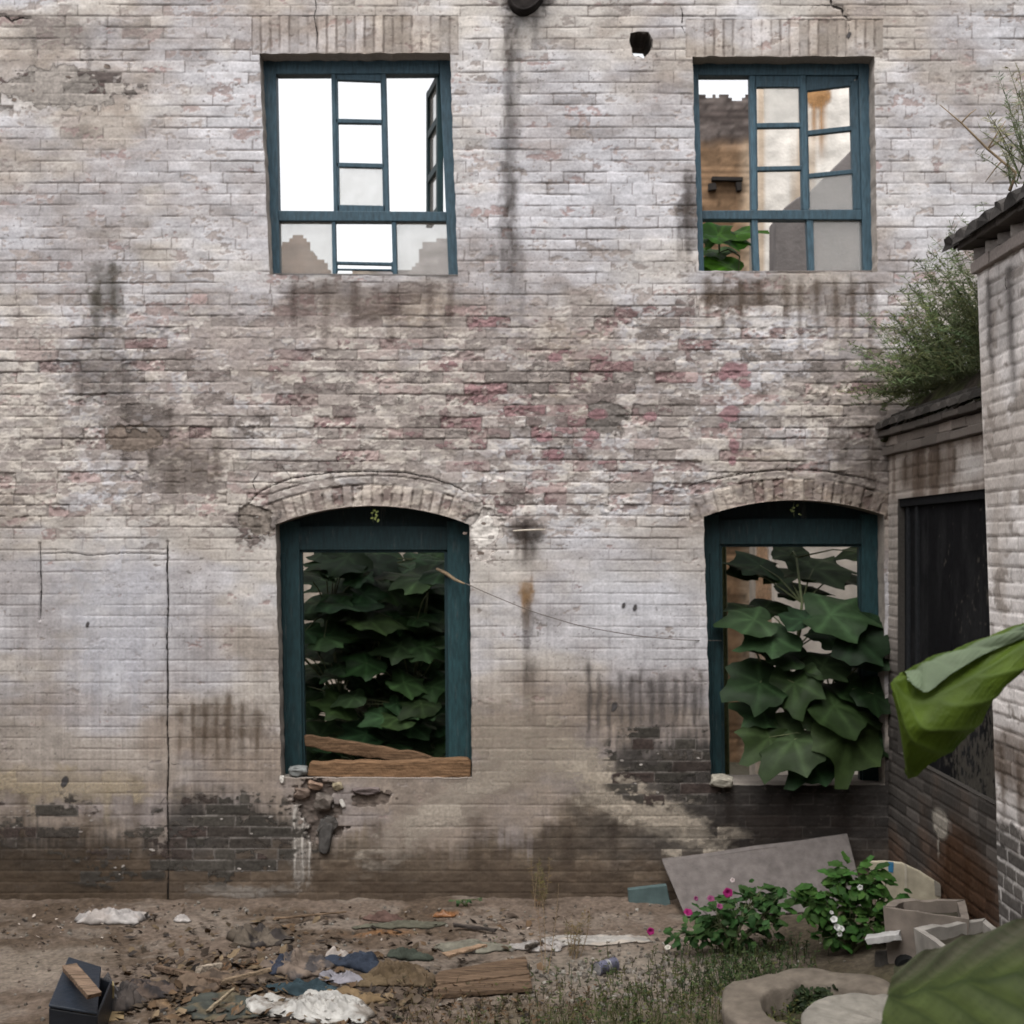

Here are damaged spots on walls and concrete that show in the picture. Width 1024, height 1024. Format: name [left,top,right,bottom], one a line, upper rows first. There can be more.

crack [40,545,180,900]
peeling [0,776,98,848]
peeling [140,777,391,883]
leakage [293,806,311,867]
leakage [406,804,462,839]
leakage [467,749,532,796]
leakage [545,738,724,857]
peeling [604,725,722,809]